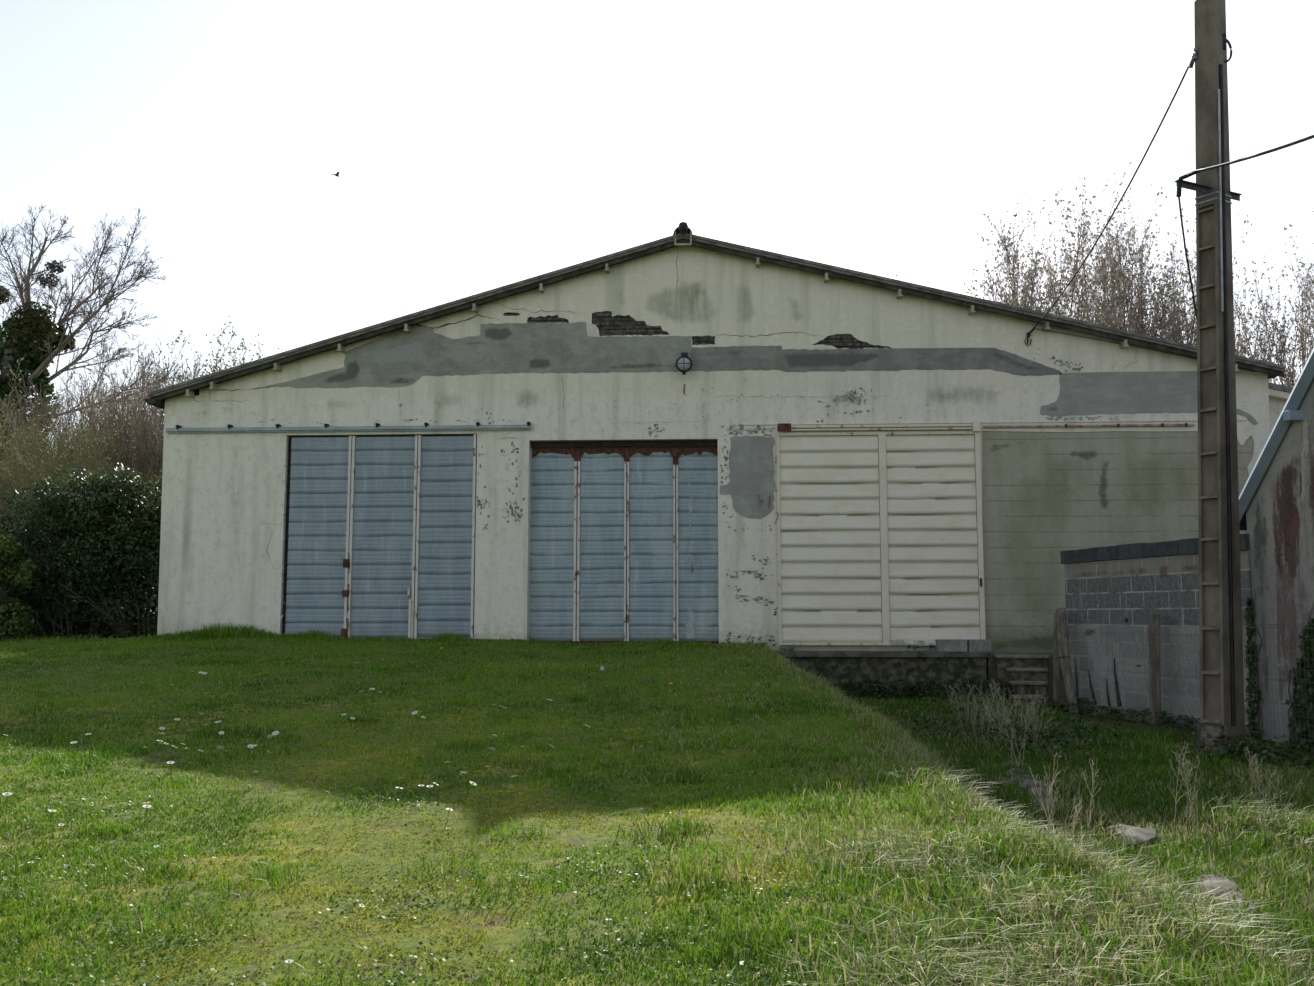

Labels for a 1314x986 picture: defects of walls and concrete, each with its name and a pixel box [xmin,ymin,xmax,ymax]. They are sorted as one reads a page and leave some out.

spalling [504,313,569,323]
spalling [814,335,890,349]
peeling [476,441,525,530]
corrosion [532,446,718,465]
peeling [726,553,777,615]
peeling [1273,461,1314,699]